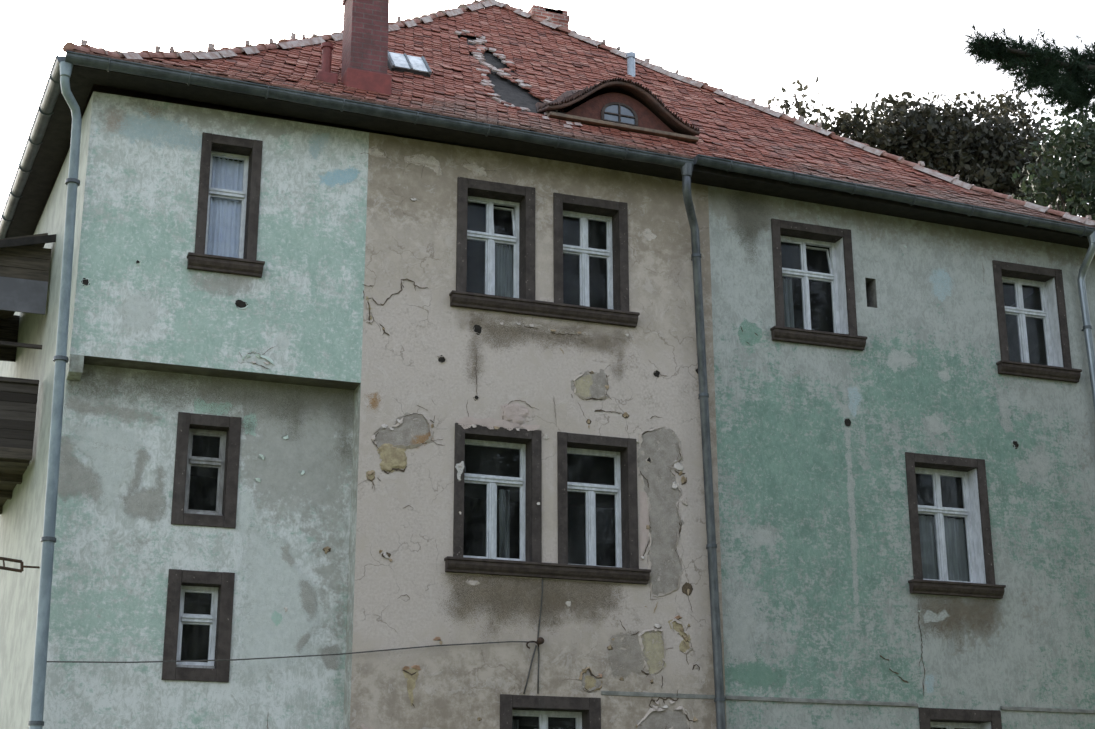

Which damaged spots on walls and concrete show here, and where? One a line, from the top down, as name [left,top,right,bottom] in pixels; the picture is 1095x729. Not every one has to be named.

crack [365,279,427,336]
spalling [571,364,612,401]
spalling [357,406,443,488]
peeling [636,426,693,600]
damp [441,573,623,641]
spalling [565,615,698,729]
crack [880,599,925,695]
damp [911,594,1003,653]